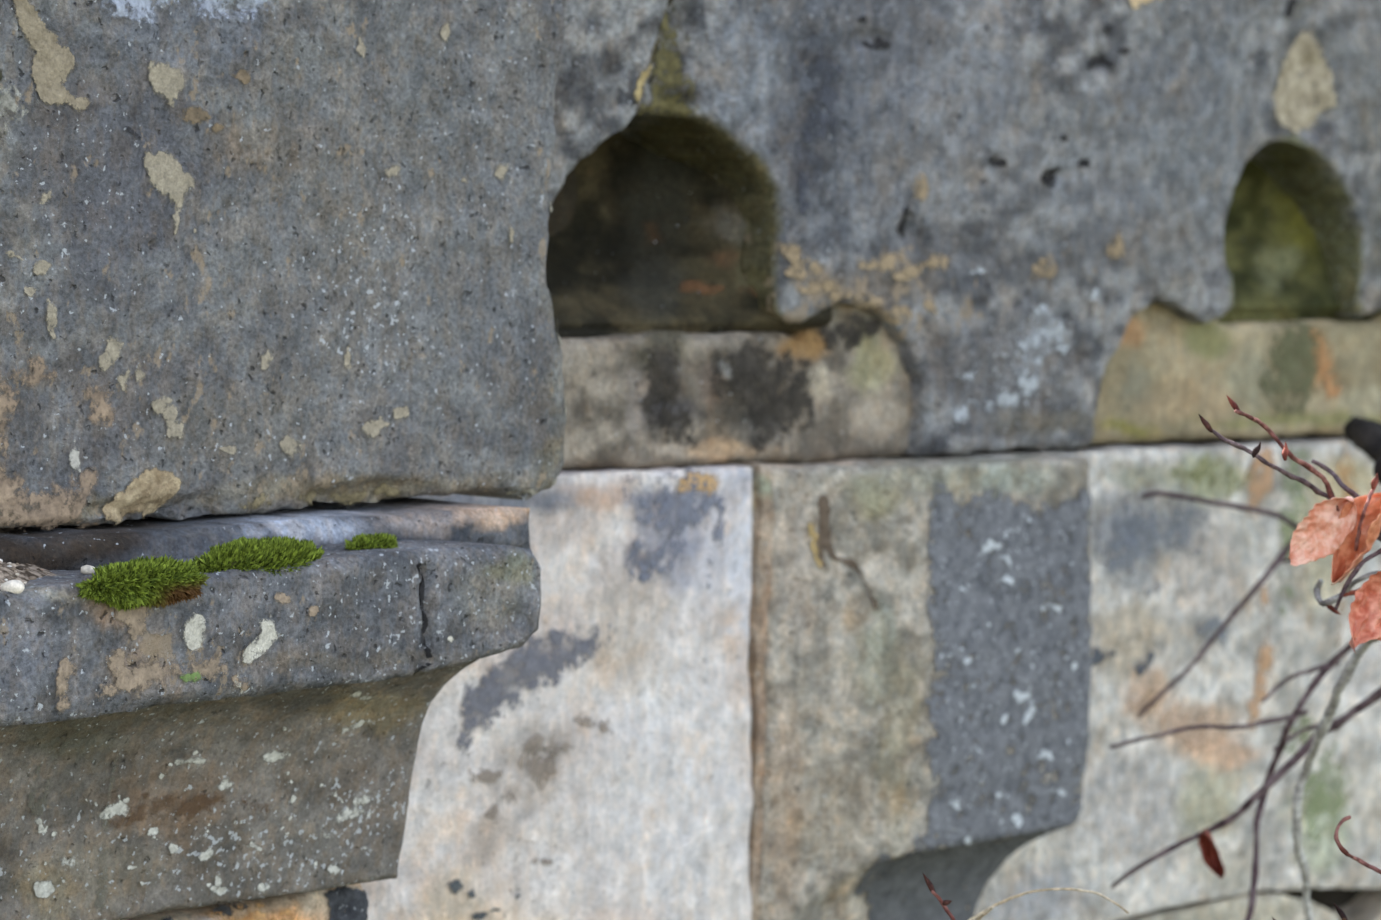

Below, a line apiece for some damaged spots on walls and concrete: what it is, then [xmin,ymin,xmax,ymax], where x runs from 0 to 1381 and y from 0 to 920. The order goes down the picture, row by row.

peeling [0,0,91,133]
peeling [148,60,184,107]
spalling [1273,31,1338,134]
peeling [144,151,197,235]
peeling [6,250,57,339]
peeling [0,347,57,450]
peeling [0,441,181,529]
peeling [87,336,145,426]
peeling [152,396,184,439]
peeling [279,435,303,456]
peeling [362,406,409,438]
crack [414,563,438,675]